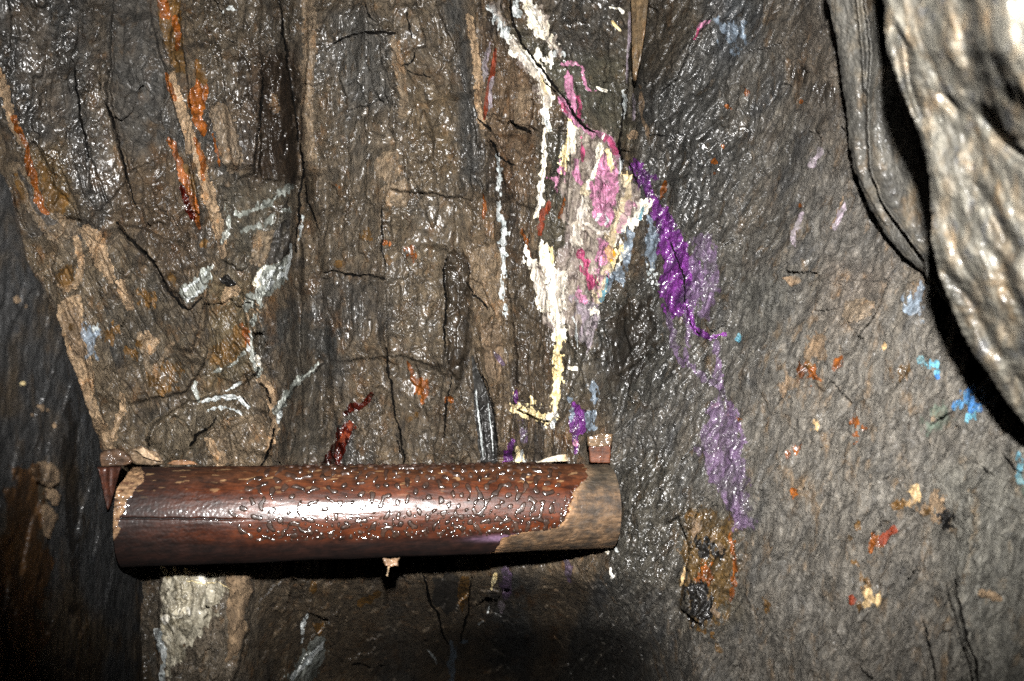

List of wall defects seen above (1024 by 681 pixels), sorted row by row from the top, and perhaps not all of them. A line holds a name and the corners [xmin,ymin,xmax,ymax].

corrosion [157,0,221,248]
crack [71,58,202,310]
corrosion [103,321,185,396]
corrosion [321,392,373,465]
crack [386,347,406,463]